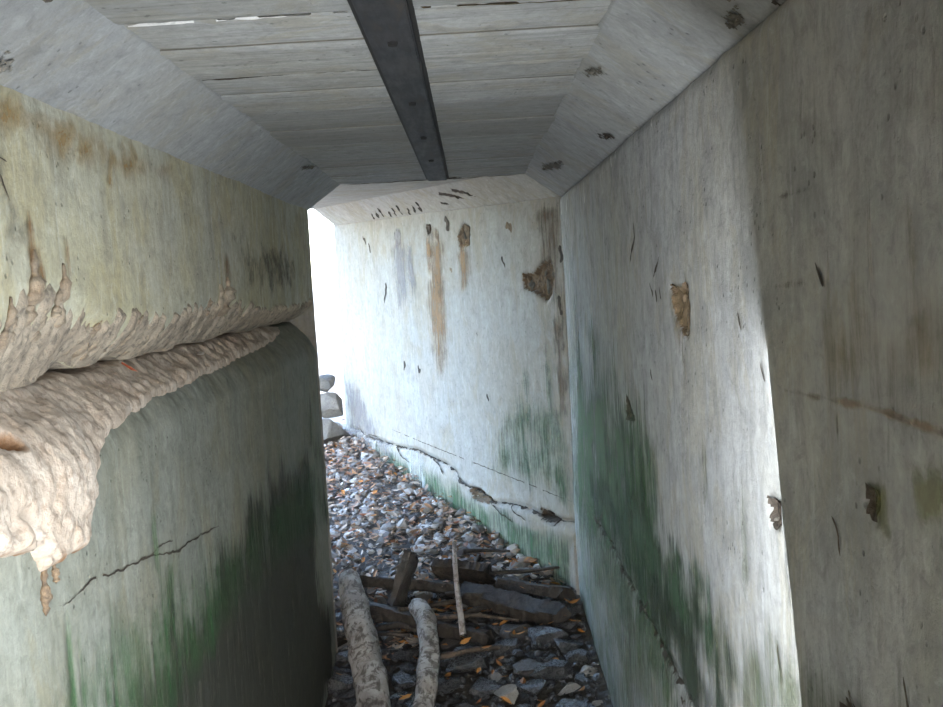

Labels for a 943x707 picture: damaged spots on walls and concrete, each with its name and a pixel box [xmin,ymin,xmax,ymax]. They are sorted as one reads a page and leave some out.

spalling [439,177,475,247]
leakage [0,249,72,350]
rust [426,233,446,369]
spalling [522,245,564,315]
spalling [649,257,690,336]
leakage [0,277,281,616]
spalling [767,495,782,530]
spalling [865,482,881,522]
crack [63,526,218,606]
leakage [130,455,333,707]
crack [350,427,693,702]
leakage [648,573,732,707]